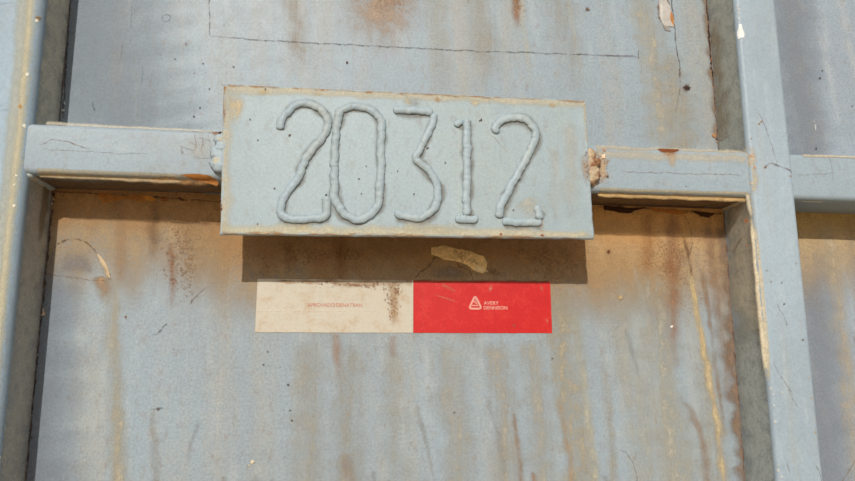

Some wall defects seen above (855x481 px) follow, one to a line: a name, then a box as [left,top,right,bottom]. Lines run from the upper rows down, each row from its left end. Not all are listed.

peeling [657,0,675,31]
rust [703,0,715,113]
rust [38,85,745,481]
spalling [415,245,488,281]